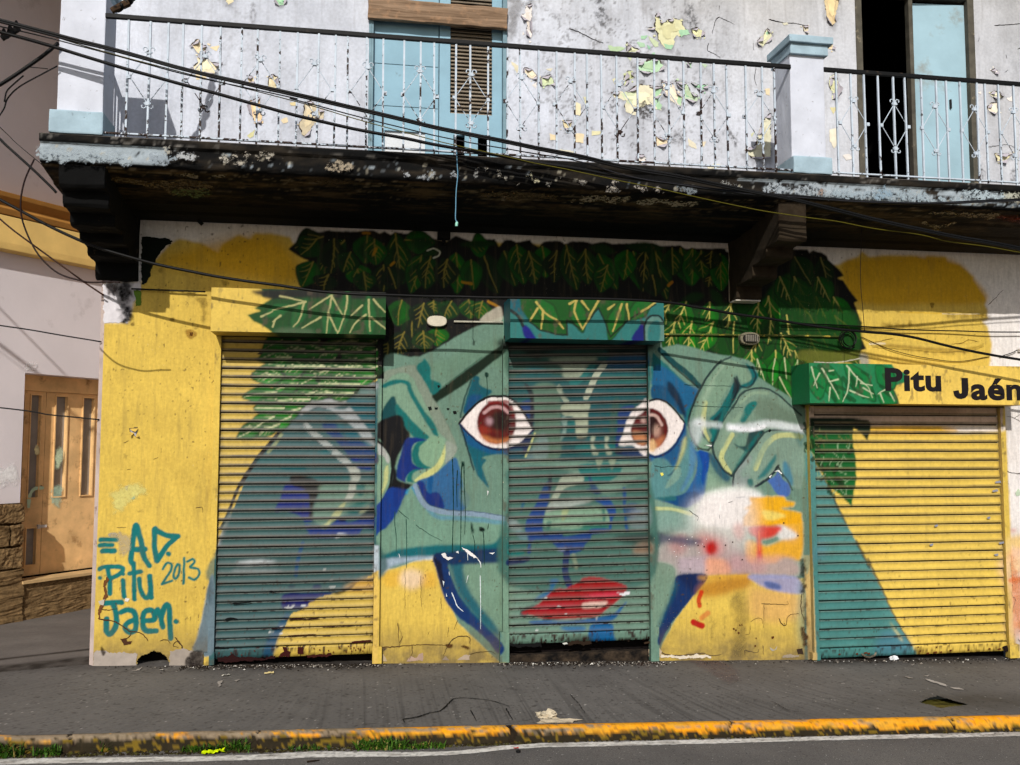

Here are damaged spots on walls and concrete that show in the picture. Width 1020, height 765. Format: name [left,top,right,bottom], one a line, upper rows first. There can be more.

peeling [521,3,533,43]
peeling [824,0,839,26]
peeling [189,39,223,80]
peeling [246,74,278,88]
peeling [511,62,555,88]
peeling [608,12,708,115]
peeling [828,75,843,114]
peeling [246,97,263,138]
peeling [550,97,601,153]
peeling [745,113,771,159]
peeling [36,146,225,199]
peeling [313,160,353,185]